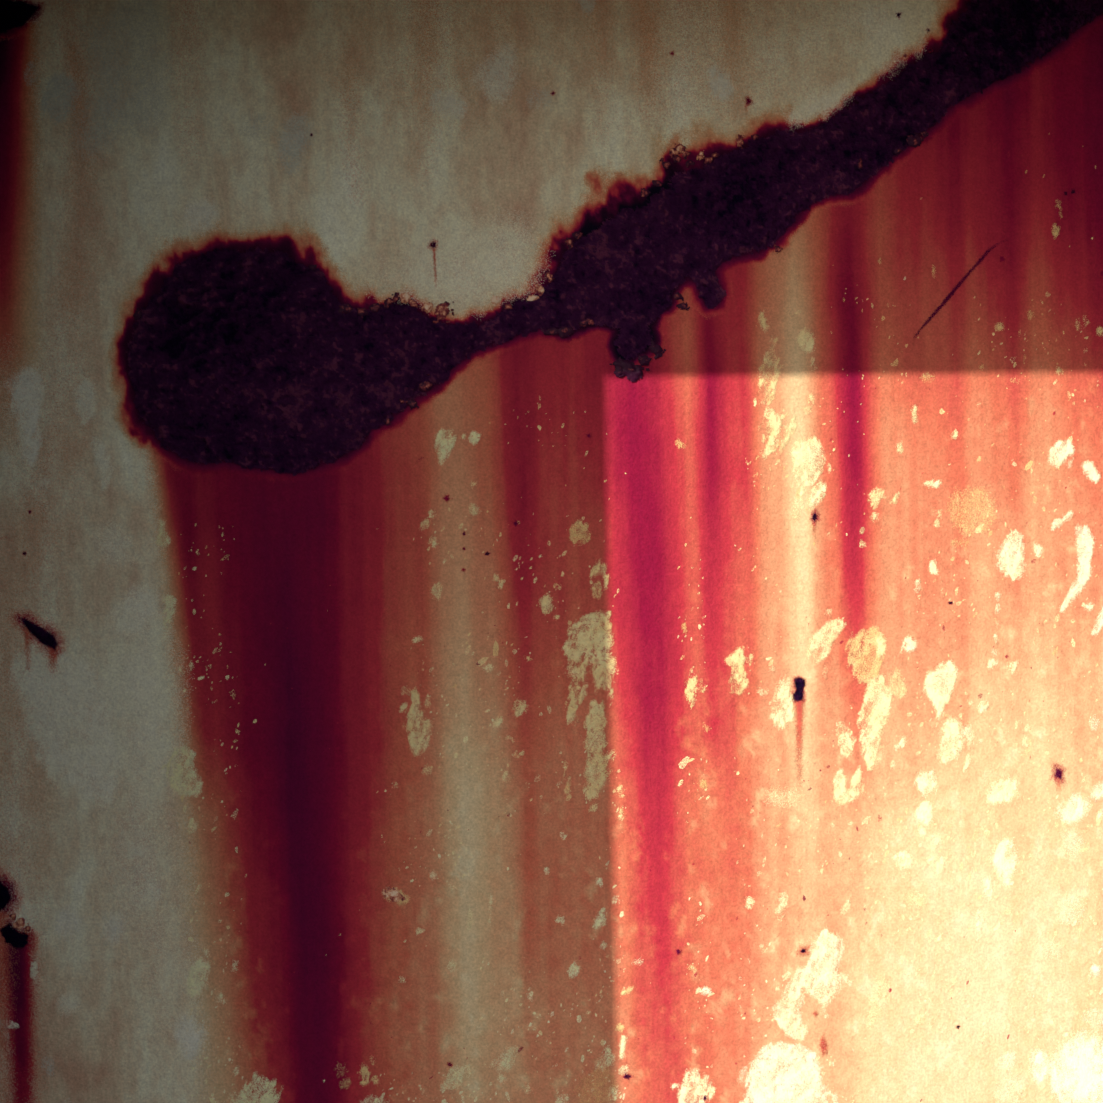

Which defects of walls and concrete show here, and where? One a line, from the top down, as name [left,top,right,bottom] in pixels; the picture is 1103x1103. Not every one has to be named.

corrosion [0,0,51,477]
corrosion [427,239,438,283]
peeling [538,583,561,619]
peeling [562,560,626,821]
peeling [807,609,908,806]
corrosion [0,866,49,1103]
peeling [227,1065,282,1103]
peeling [335,1055,385,1103]
peeling [776,892,789,921]
peeling [740,927,852,1103]